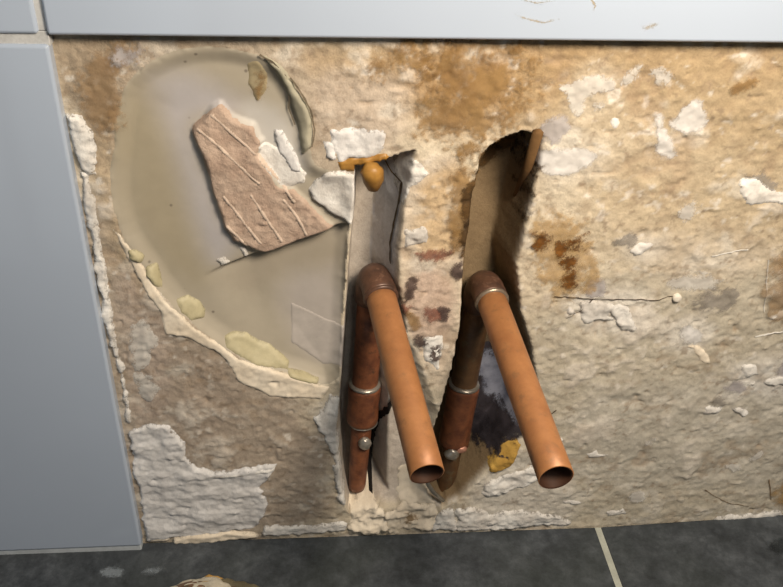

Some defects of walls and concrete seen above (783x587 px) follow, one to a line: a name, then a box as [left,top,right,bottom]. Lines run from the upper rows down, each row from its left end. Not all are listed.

spalling [738,177,783,205]
spalling [110,46,356,505]
rust [531,231,590,291]
peeling [148,530,259,544]